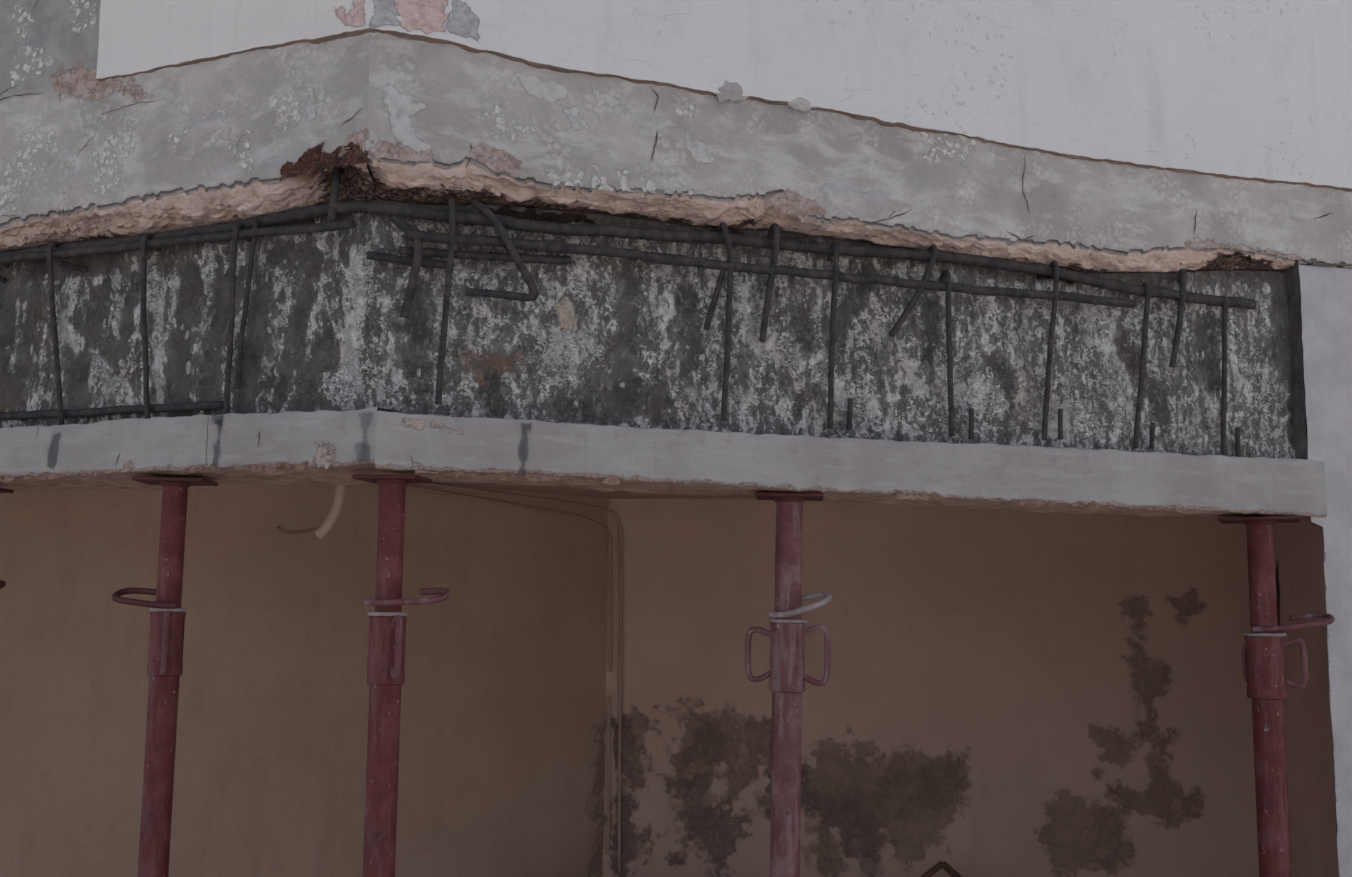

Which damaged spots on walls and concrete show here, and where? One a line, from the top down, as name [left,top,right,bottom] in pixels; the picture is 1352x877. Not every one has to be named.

peeling [331,0,480,40]
corrosion [280,142,370,181]
spalling [0,128,1308,460]
spalling [184,443,335,473]
leakage [590,698,772,877]
leakage [801,730,969,877]
leakage [1035,595,1204,877]